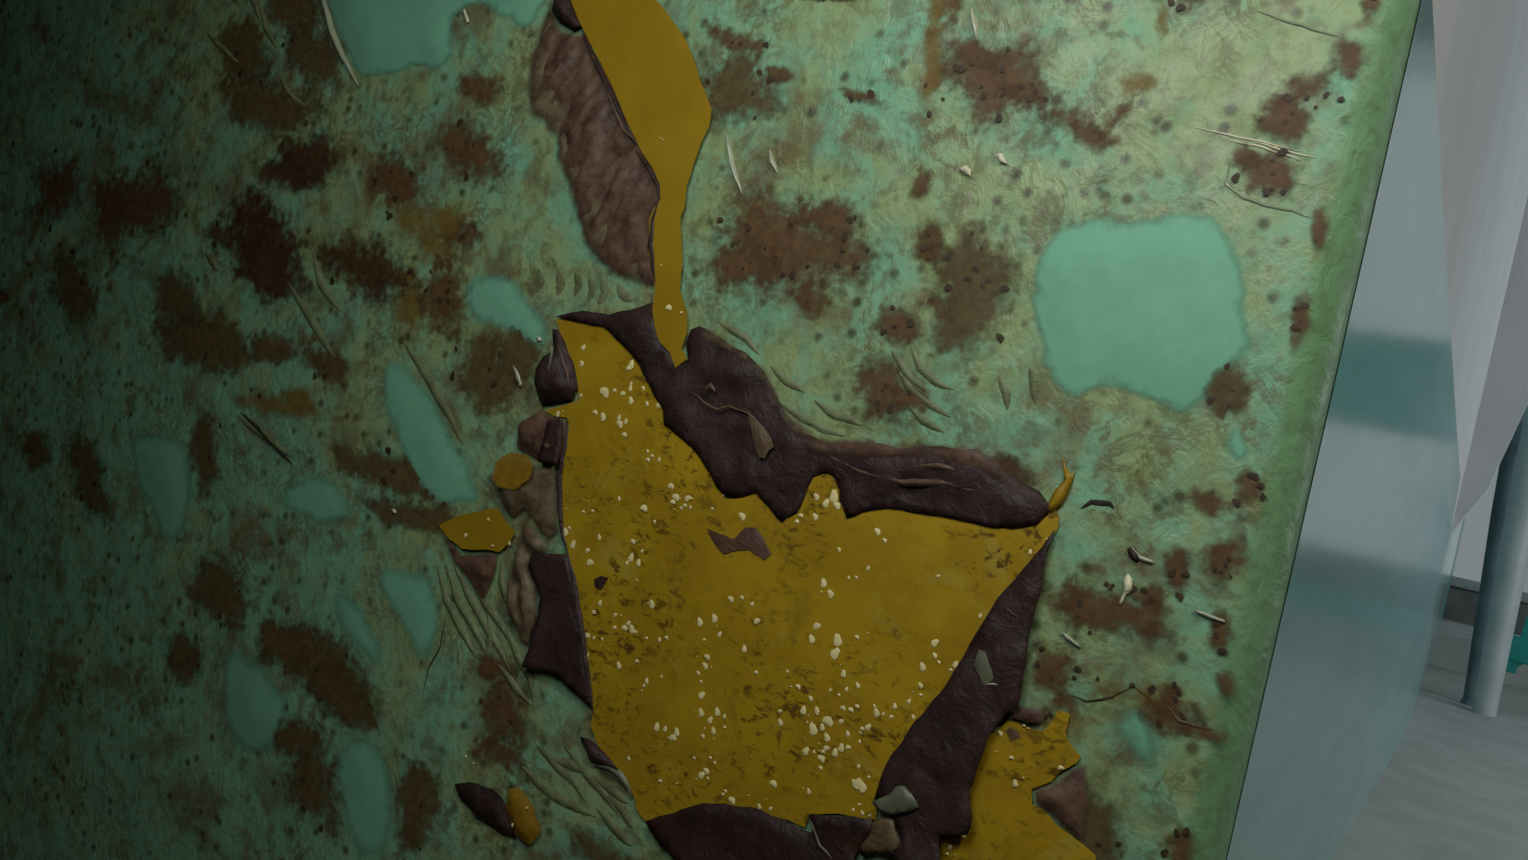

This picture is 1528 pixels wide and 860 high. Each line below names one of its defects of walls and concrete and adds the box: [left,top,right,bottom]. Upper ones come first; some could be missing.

rust [937,0,1130,150]
rust [1231,41,1362,196]
rust [911,175,928,197]
rust [713,186,874,318]
rust [916,223,953,265]
rust [1311,209,1329,248]
rust [1290,302,1310,343]
peeling [439,0,1096,860]
rust [1055,549,1190,639]
peeling [1119,546,1154,605]
rust [1211,614,1235,696]
rust [1143,681,1225,741]